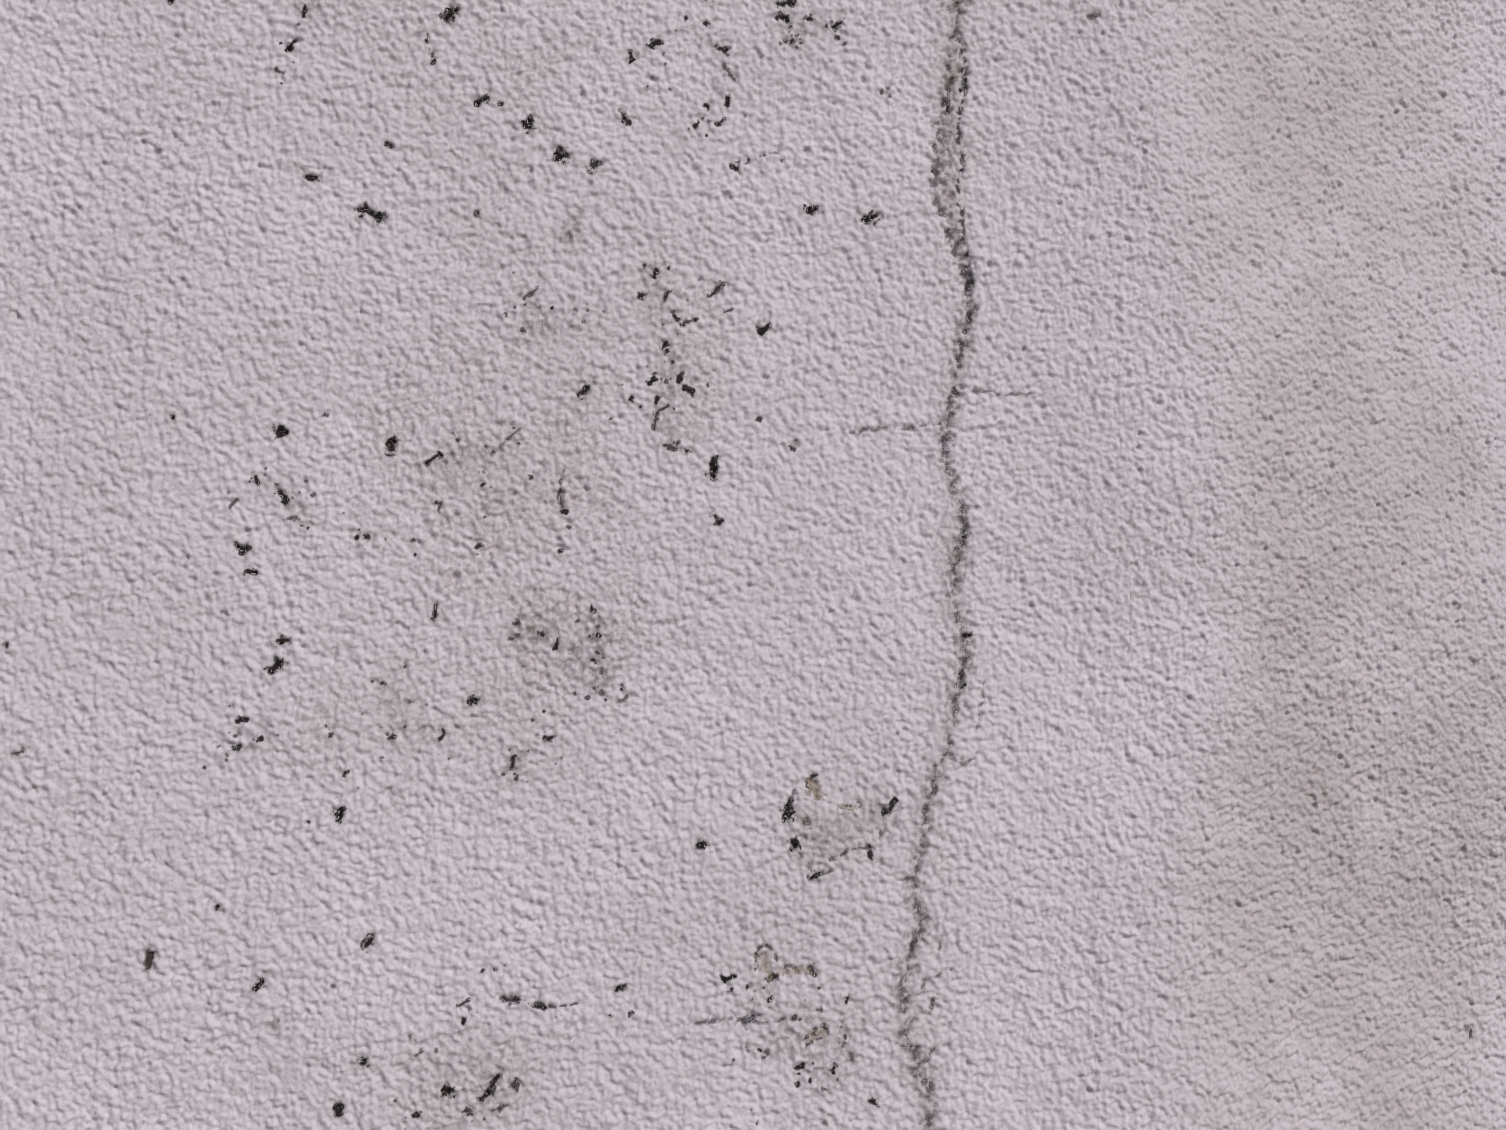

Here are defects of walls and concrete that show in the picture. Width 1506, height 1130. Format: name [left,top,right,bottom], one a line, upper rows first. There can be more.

crack [933,37,968,283]